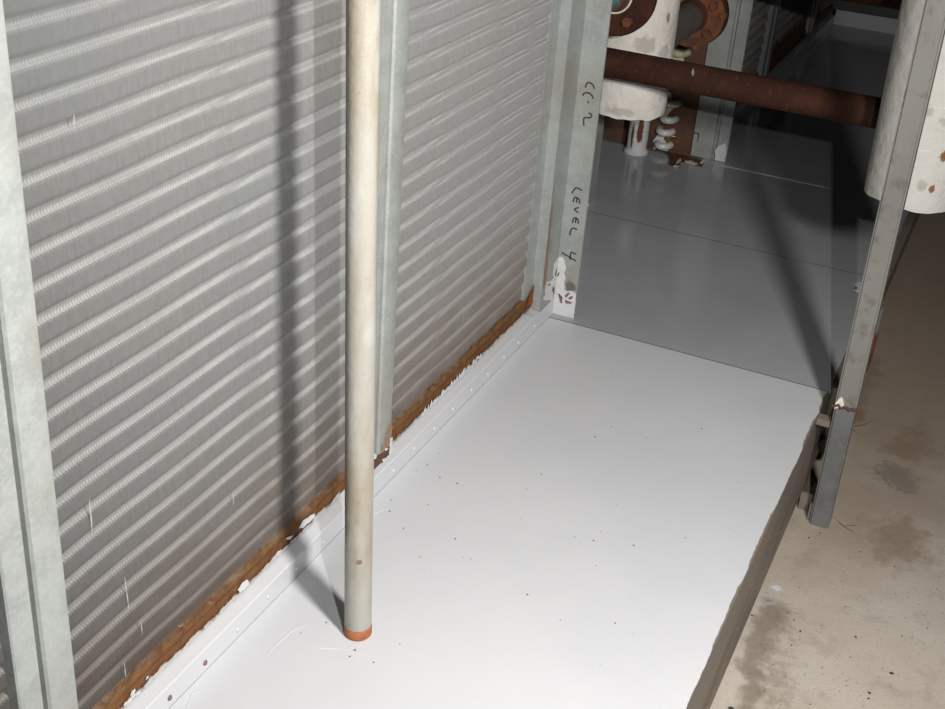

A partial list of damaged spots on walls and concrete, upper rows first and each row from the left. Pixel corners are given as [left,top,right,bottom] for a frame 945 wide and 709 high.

corrosion [756,15,808,75]
corrosion [381,220,552,453]
corrosion [105,476,345,709]